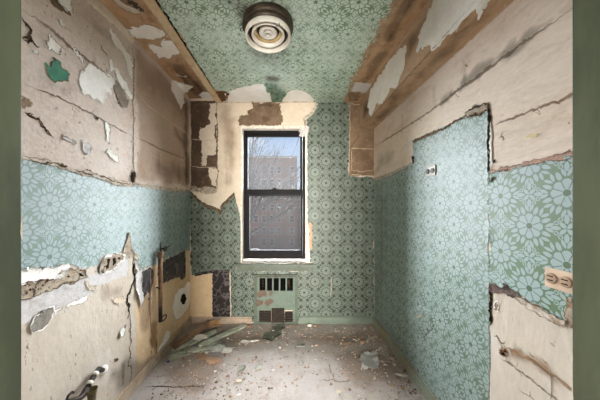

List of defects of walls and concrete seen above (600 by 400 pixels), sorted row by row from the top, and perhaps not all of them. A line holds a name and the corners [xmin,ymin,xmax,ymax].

peeling [32,28,134,108]
peeling [127,24,180,59]
peeling [348,45,407,116]
peeling [416,0,490,53]
crack [381,9,572,143]
spalling [186,84,314,194]
crack [487,94,572,181]
spalling [489,149,573,183]
spalling [99,232,139,275]
spalling [21,268,98,333]
crack [126,258,136,376]
crack [488,290,572,400]